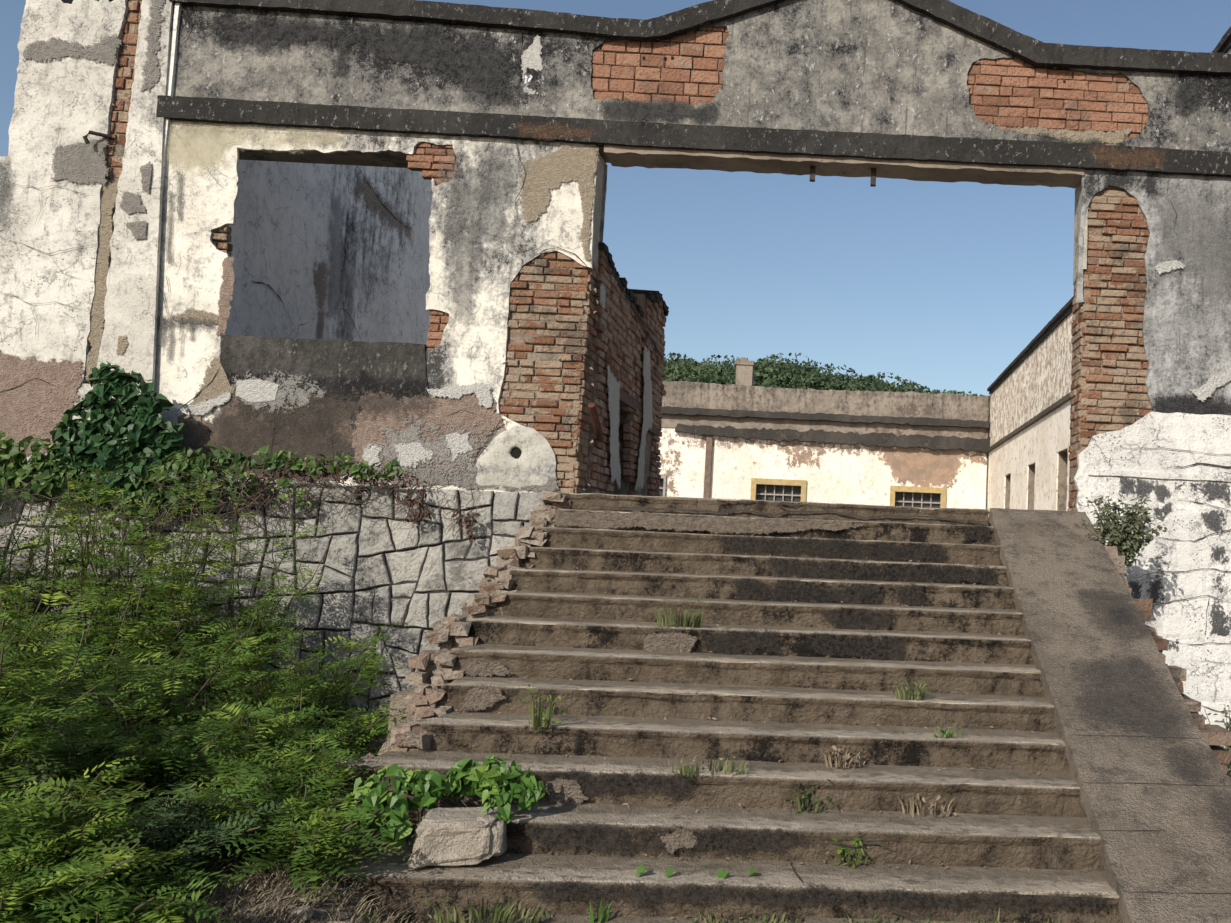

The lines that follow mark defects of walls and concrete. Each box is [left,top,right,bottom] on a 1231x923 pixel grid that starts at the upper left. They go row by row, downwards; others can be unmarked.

leakage [212,13,525,105]
flaking render [591,27,729,105]
flaking render [967,58,1148,145]
flaking render [0,0,165,456]
flaking render [161,142,654,493]
flaking render [1075,186,1185,450]
leakage [1076,589,1209,783]